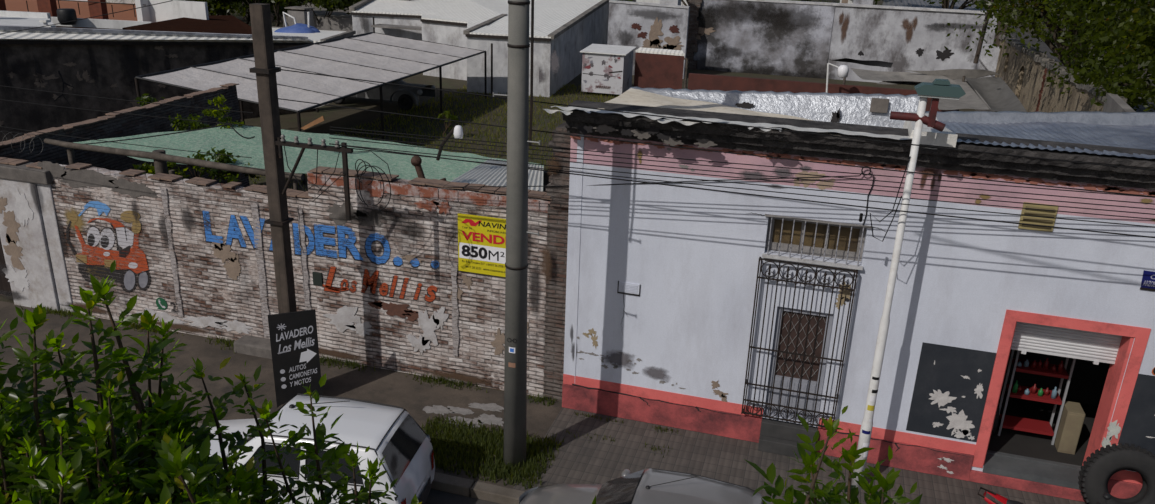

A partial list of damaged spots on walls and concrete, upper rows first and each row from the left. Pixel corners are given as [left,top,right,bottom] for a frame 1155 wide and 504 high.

damp [697,5,815,28]
damp [693,48,827,79]
flaking render [0,189,34,291]
peeling [576,328,642,374]
peeling [929,369,984,440]